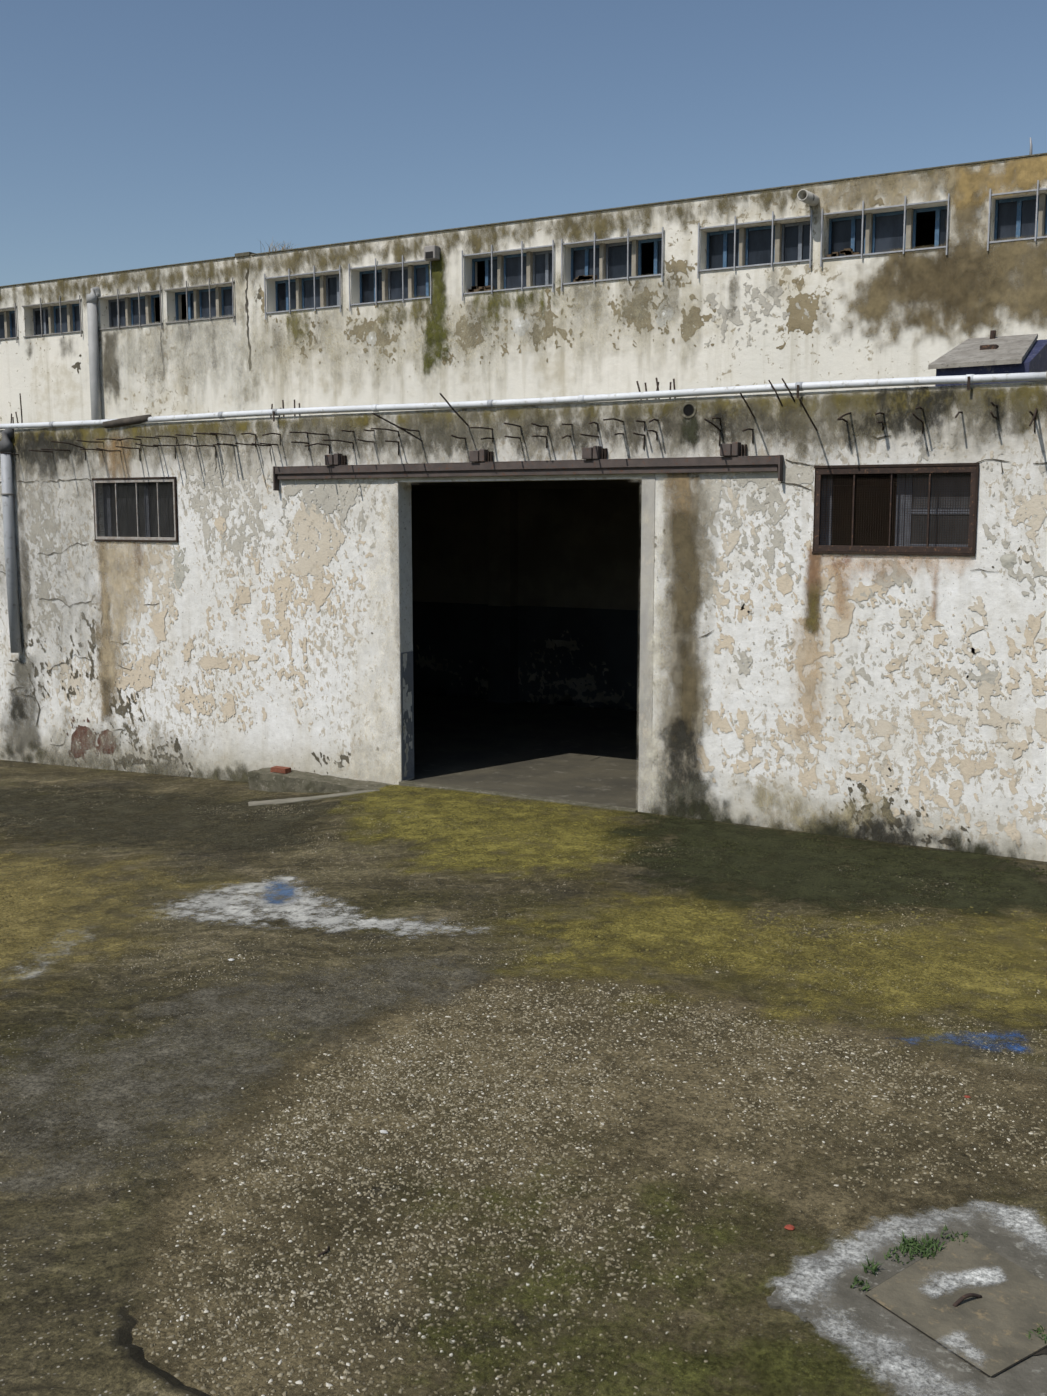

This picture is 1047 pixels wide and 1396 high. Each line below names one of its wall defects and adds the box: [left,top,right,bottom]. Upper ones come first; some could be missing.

peeling [255,282,328,364]
peeling [344,286,583,370]
spalling [636,378,676,400]
peeling [604,231,835,350]
water stain [846,385,955,445]
water stain [816,156,1047,341]
water stain [4,429,84,754]
water stain [97,539,148,719]
peeling [0,400,422,781]
water stain [643,473,714,818]
peeling [691,378,1047,854]
water stain [0,781,355,852]